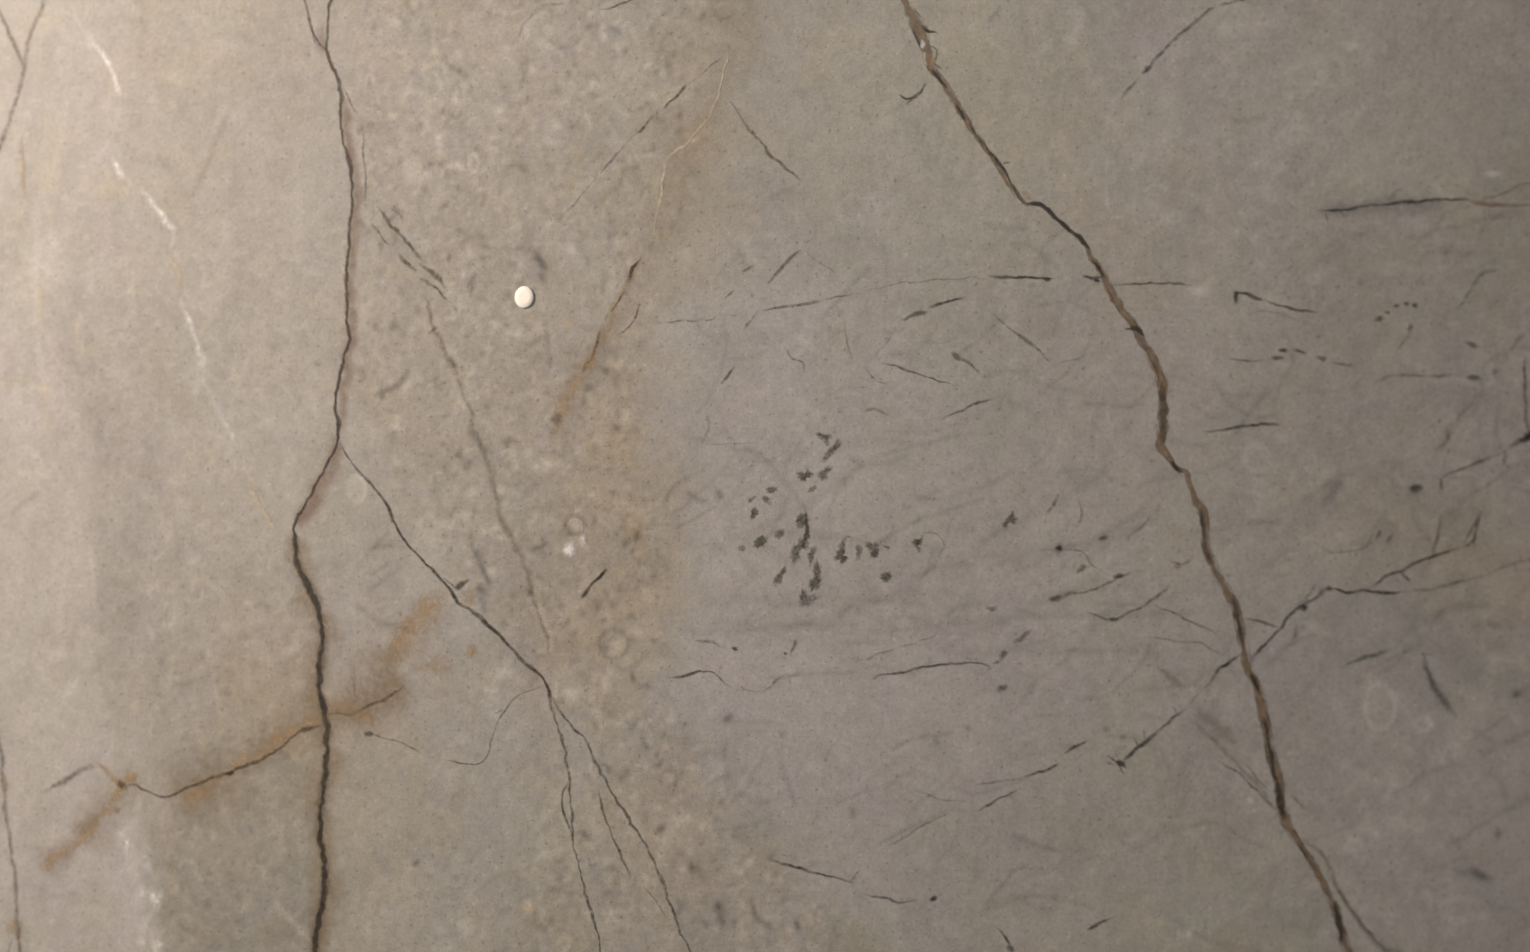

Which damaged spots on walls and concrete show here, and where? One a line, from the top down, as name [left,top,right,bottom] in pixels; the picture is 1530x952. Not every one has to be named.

crack [1,4,43,140]
crack [1329,192,1530,211]
crack [1519,368,1530,442]
crack [292,0,690,952]
crack [891,0,1477,952]
corrosion [81,721,317,839]